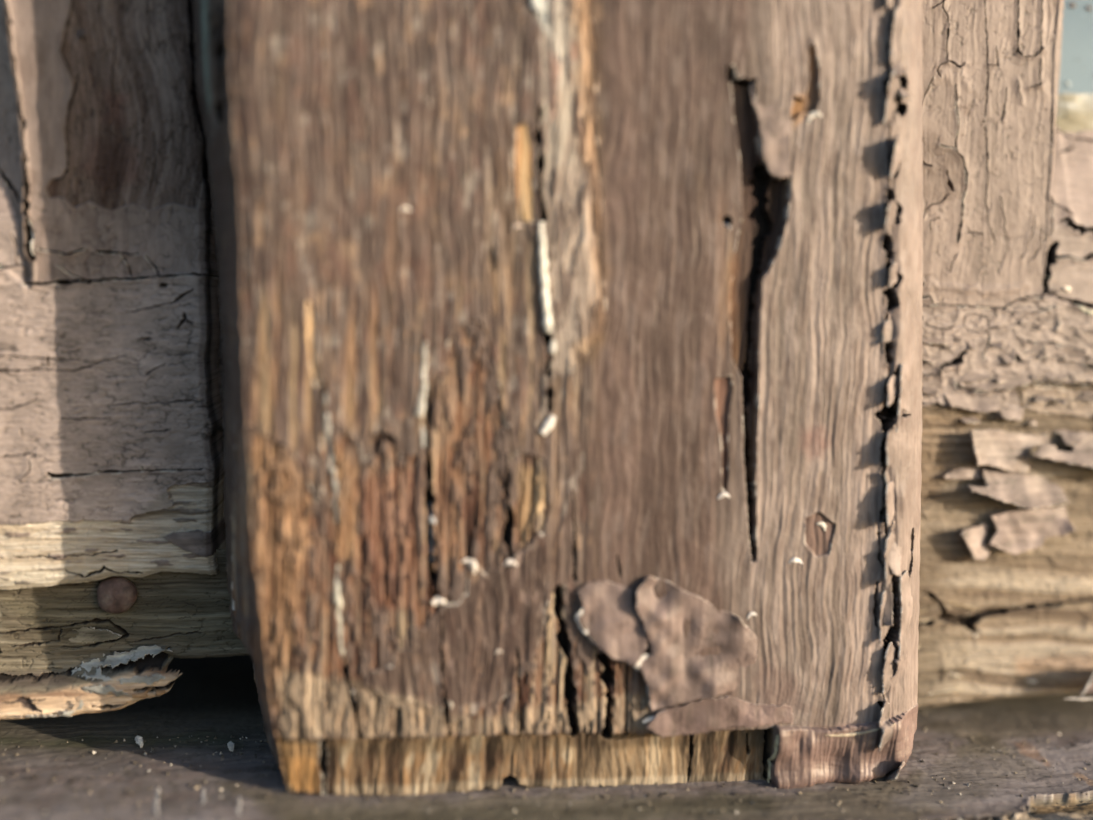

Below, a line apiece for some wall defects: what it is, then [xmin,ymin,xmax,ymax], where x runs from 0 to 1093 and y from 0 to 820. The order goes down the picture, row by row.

crack [0,0,219,330]
peeling [45,0,210,211]
peeling [0,320,793,783]
crack [423,381,453,735]
crack [502,454,516,558]
crack [533,104,549,222]
crack [740,163,776,555]
peeling [884,200,897,232]
peeling [890,134,902,178]
peeling [883,0,912,124]
peeling [825,342,1093,752]
crack [873,0,1093,709]